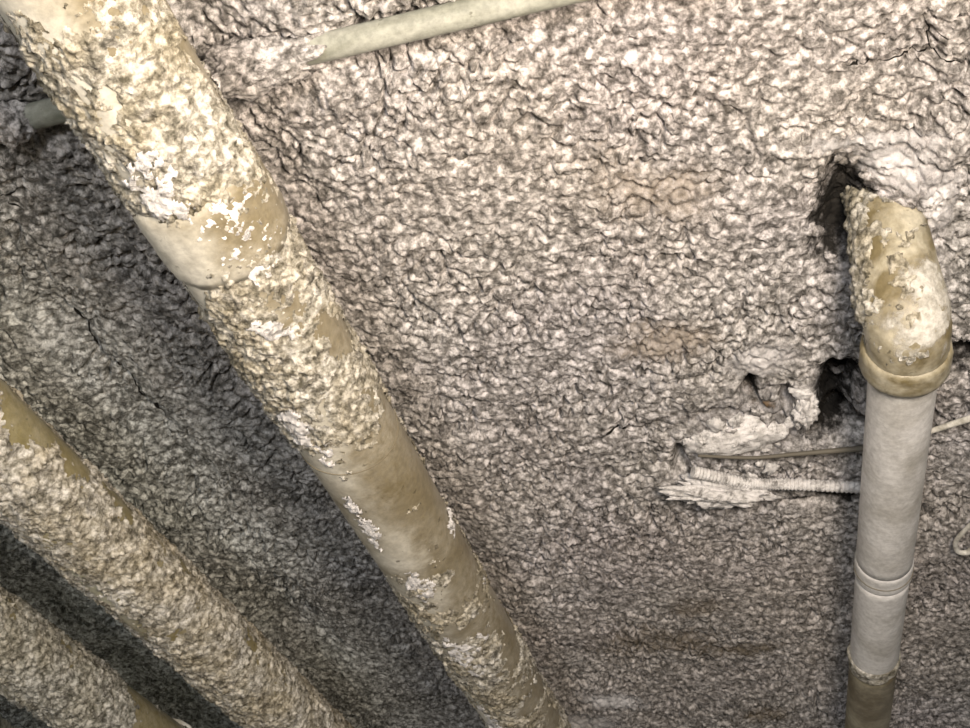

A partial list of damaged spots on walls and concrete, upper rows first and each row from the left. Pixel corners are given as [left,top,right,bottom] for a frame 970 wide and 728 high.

spalling [802,151,877,274]
spalling [682,357,864,448]
spalling [741,441,781,479]
spalling [821,491,856,504]